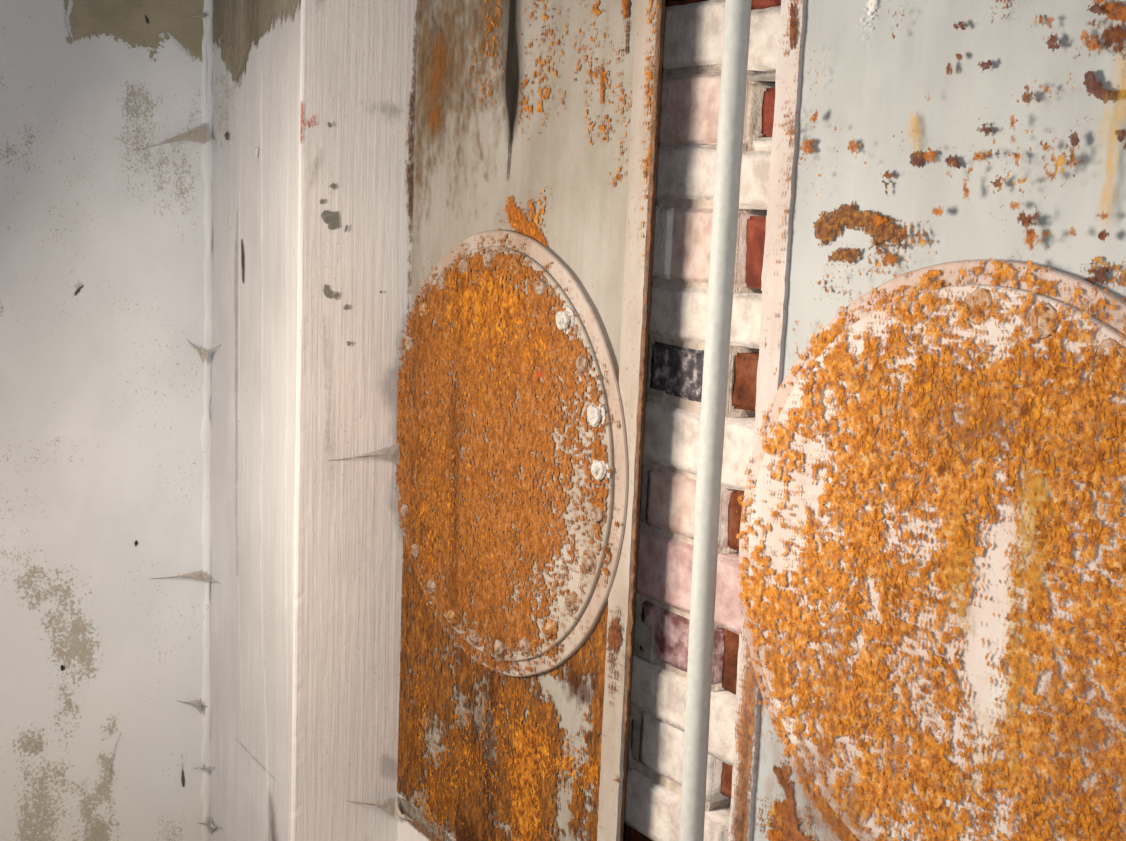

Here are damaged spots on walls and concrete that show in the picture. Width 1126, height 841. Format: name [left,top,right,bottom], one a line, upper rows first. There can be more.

peeling [64,0,300,94]
corrosion [395,0,661,841]
corrosion [728,0,1126,841]